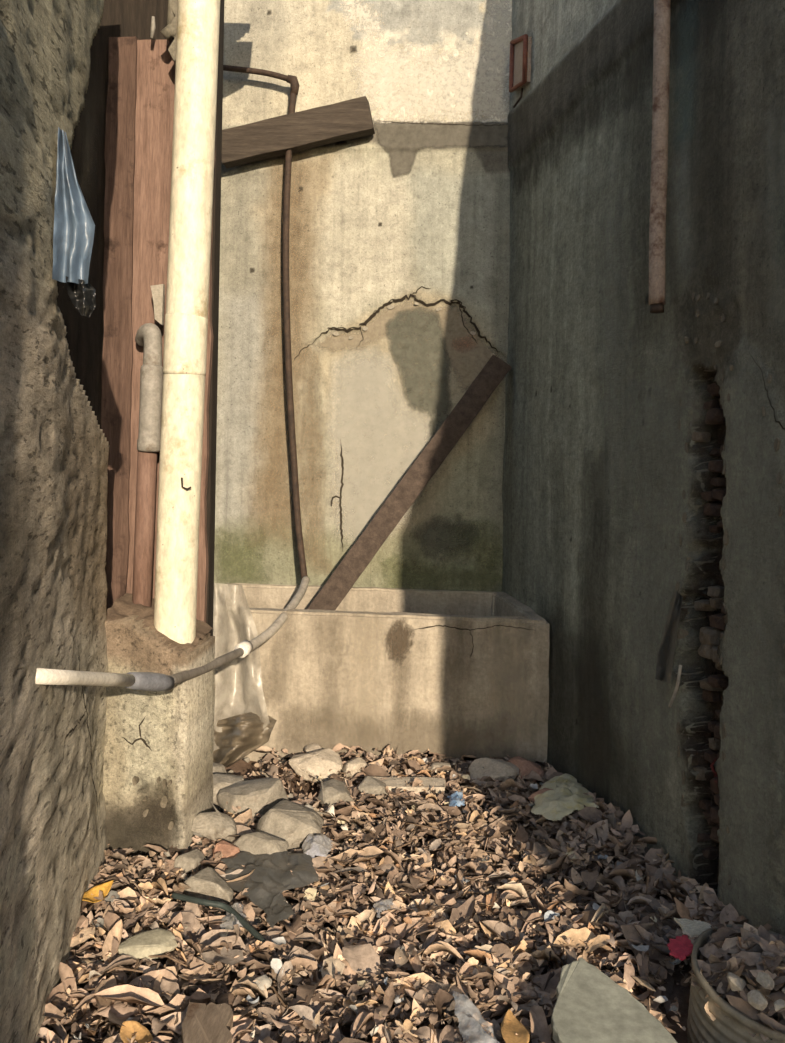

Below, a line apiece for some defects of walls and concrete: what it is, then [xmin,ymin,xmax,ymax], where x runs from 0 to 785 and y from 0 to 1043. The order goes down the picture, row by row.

flaking render [318,301,497,390]
water stain [387,308,452,435]
crack [331,440,344,551]